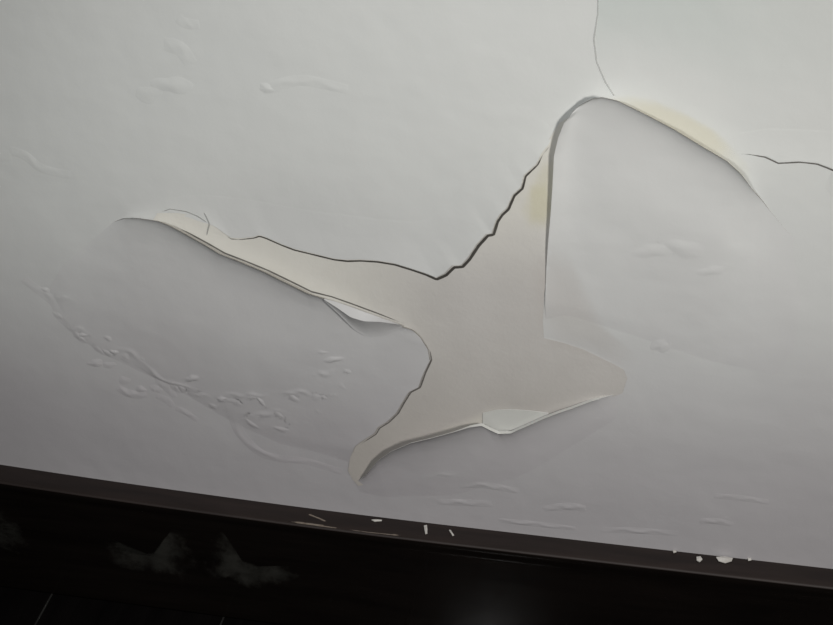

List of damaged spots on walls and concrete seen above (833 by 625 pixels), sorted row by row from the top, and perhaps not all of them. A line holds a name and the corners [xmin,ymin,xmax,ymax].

peeling [49,116,627,497]